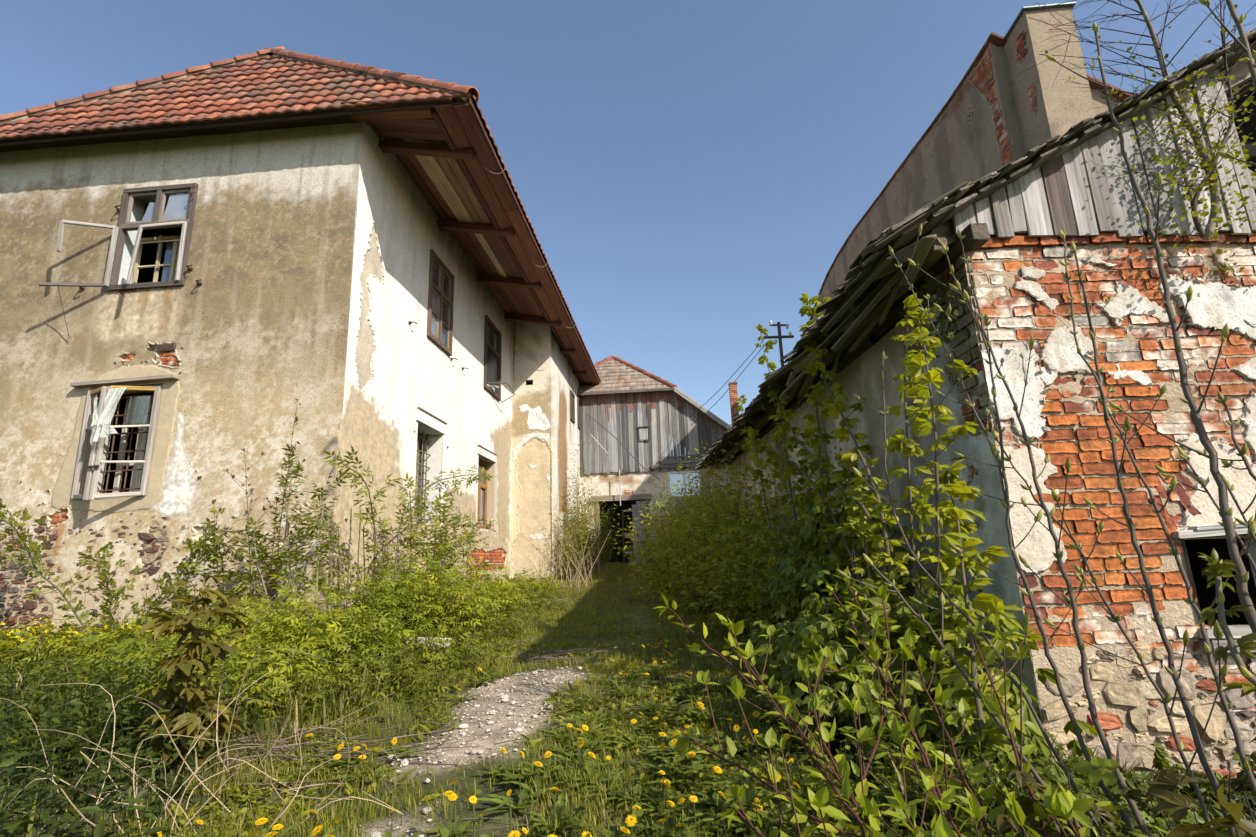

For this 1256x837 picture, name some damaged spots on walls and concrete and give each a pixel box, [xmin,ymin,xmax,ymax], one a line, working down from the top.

damp [95,288,182,342]
flaking render [113,341,184,374]
flaking render [312,220,568,615]
flaking render [926,232,1256,712]